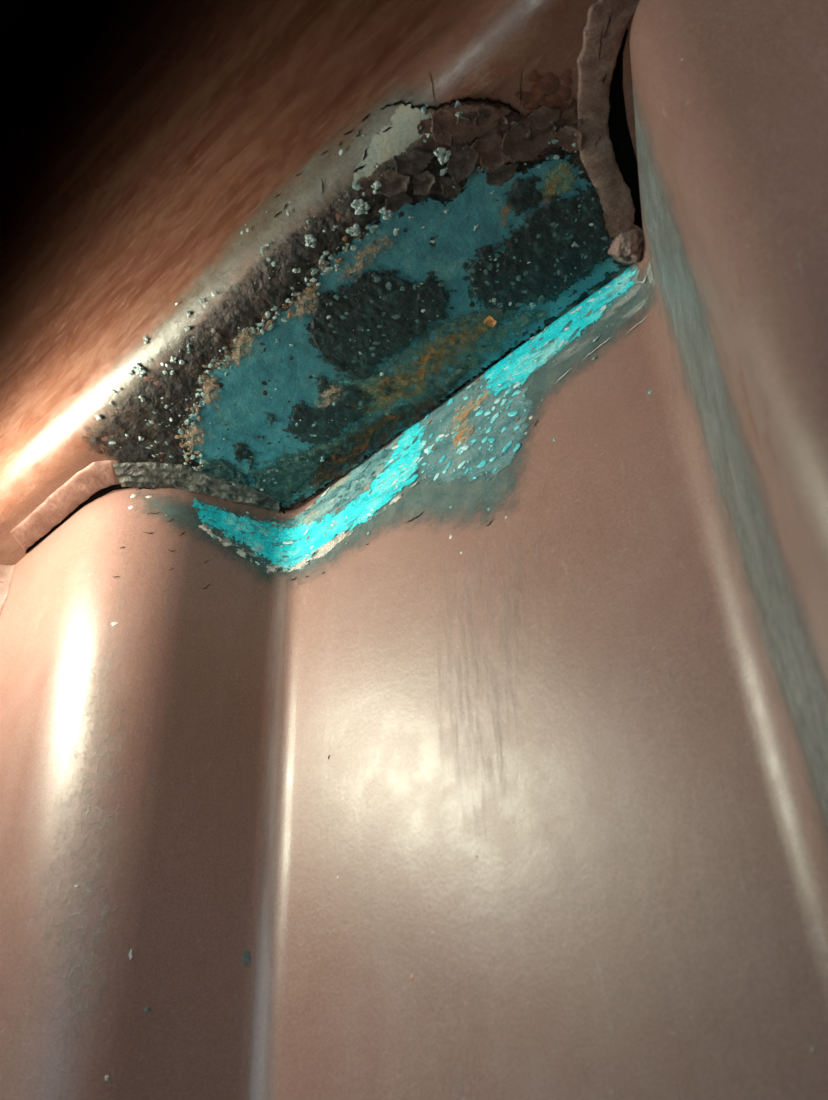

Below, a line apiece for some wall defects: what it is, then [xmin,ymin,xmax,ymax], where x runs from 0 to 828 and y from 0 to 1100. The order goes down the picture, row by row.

rust [291,291,317,321]
rust [228,329,255,366]
rust [199,375,219,408]
rust [308,324,488,487]
rust [183,425,204,449]
peeling [84,92,650,1100]